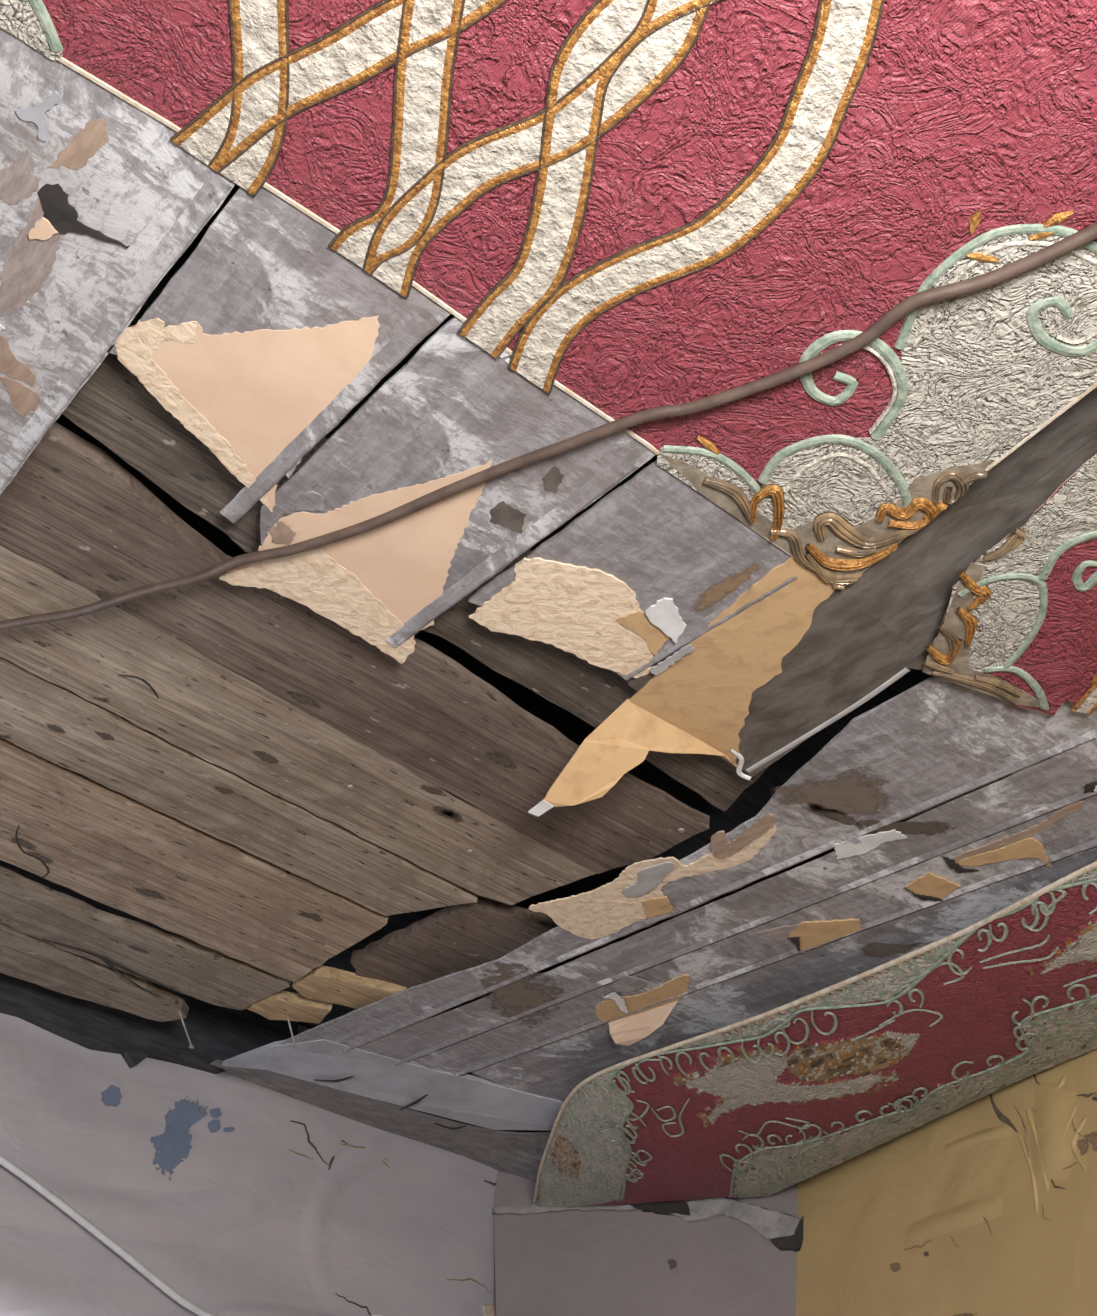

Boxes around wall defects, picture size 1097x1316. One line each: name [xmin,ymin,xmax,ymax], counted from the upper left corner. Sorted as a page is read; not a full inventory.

peeling [0,91,109,418]
peeling [269,491,324,545]
peeling [616,597,695,675]
peeling [730,749,751,780]
peeling [528,799,554,816]
peeling [710,813,777,859]
peeling [834,829,907,859]
peeling [959,837,1052,868]
peeling [622,861,674,919]
crack [43,939,181,999]
crack [289,1120,390,1170]
crack [989,1074,1097,1220]